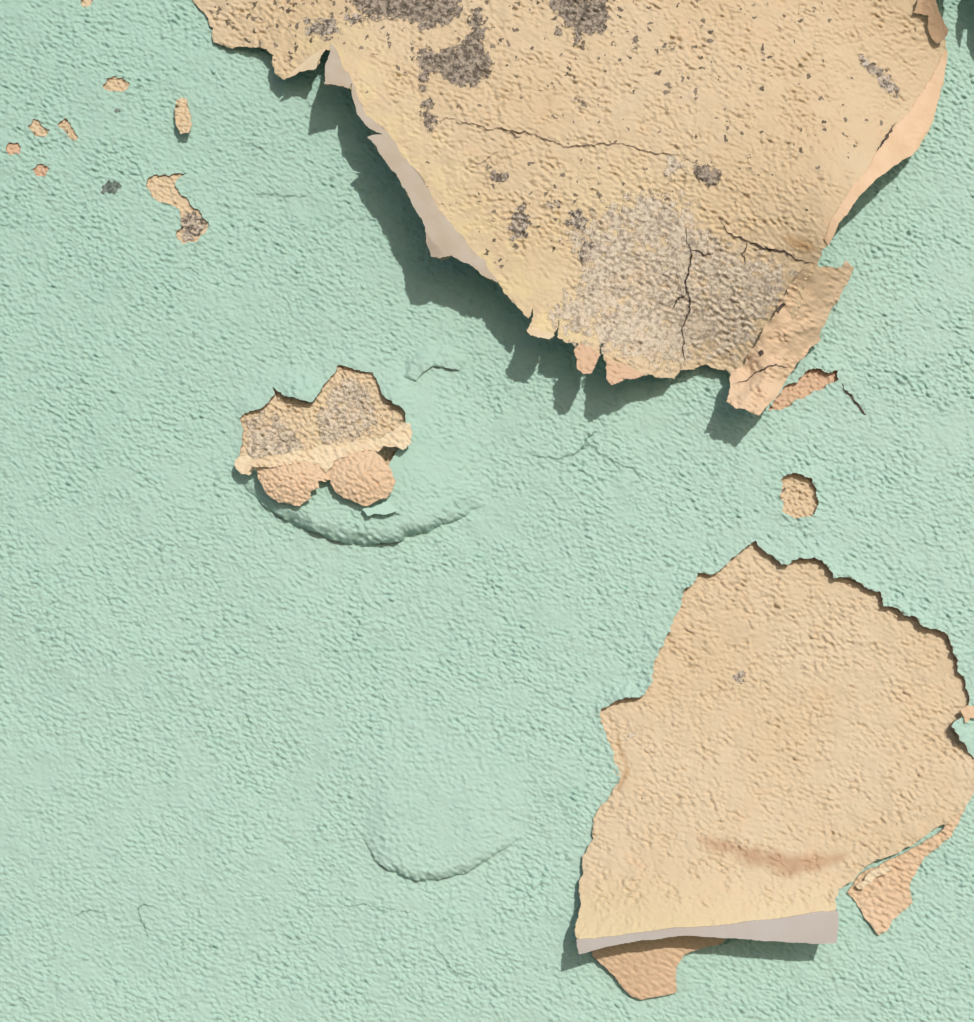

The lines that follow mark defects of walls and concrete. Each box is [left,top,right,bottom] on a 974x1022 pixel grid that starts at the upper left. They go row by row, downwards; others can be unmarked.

peeling [103,77,130,92]
peeling [28,119,78,141]
peeling [174,97,193,134]
peeling [32,164,49,177]
peeling [147,174,209,244]
peeling [193,0,949,416]
crack [719,219,815,264]
crack [672,227,713,358]
peeling [235,365,413,516]
peeling [780,473,818,518]
peeling [575,541,974,1000]